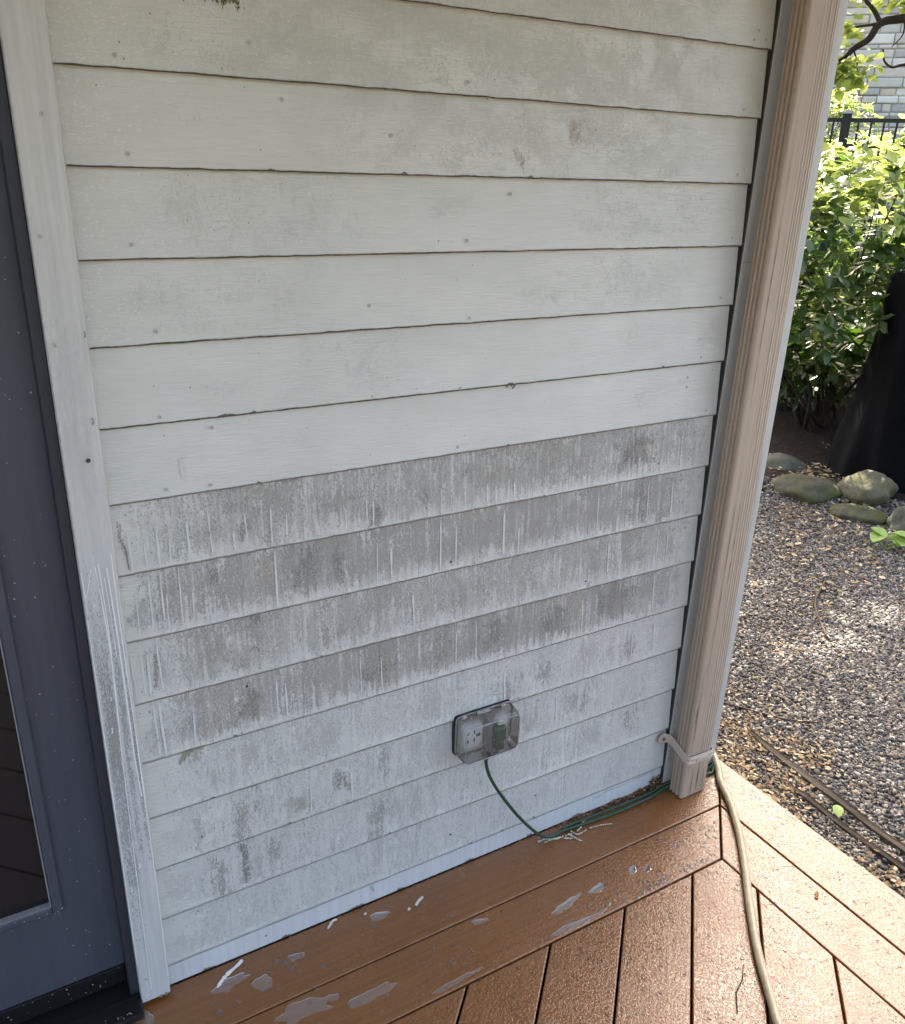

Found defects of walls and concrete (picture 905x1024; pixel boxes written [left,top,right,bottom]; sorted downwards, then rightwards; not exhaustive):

leakage [36,230,725,990]